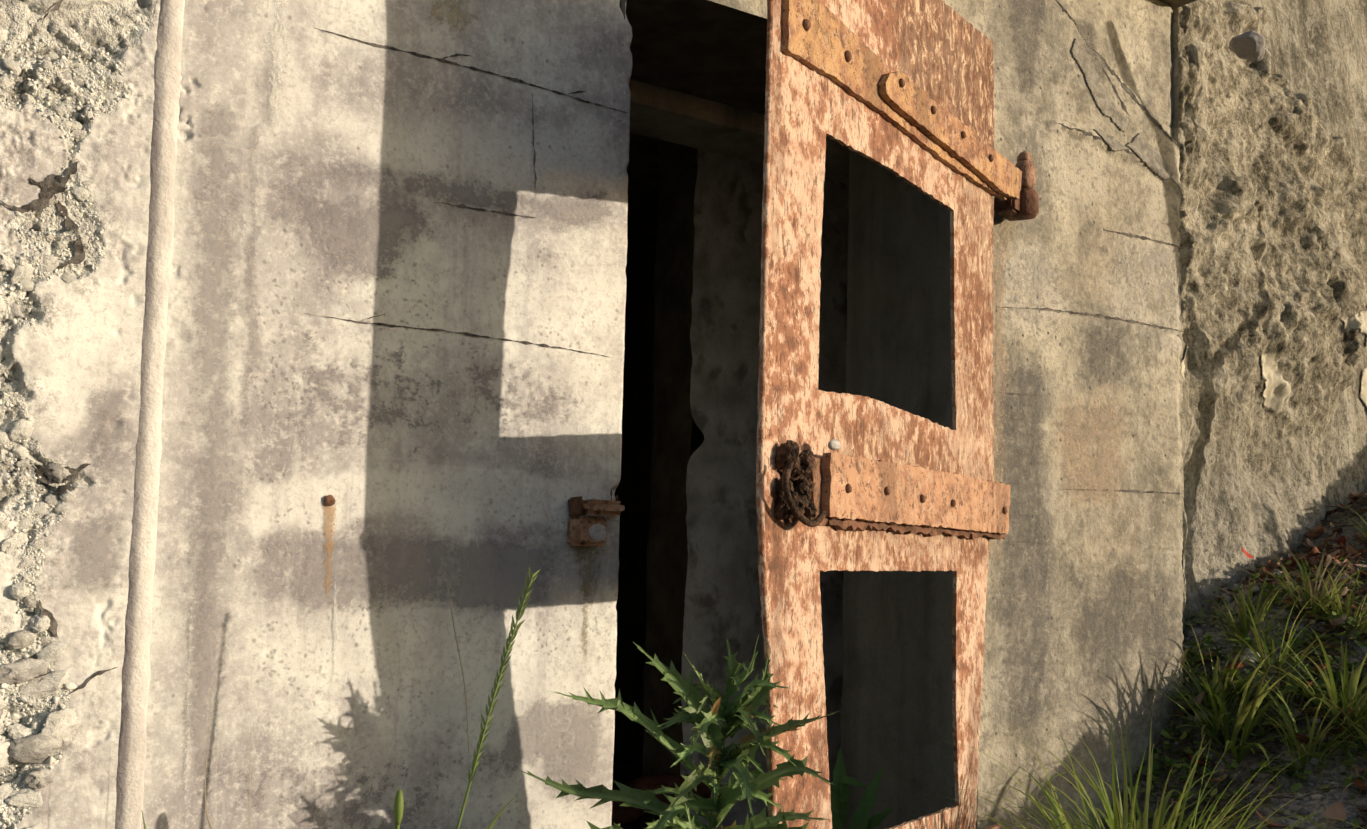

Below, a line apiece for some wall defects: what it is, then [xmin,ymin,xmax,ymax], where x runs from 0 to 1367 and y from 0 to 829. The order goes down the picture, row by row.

crack [1056,0,1183,198]
leakage [278,158,613,278]
spalling [0,0,159,829]
peeling [1261,351,1291,415]
peeling [1341,310,1367,348]
rust [324,505,337,664]
leakage [264,538,546,609]